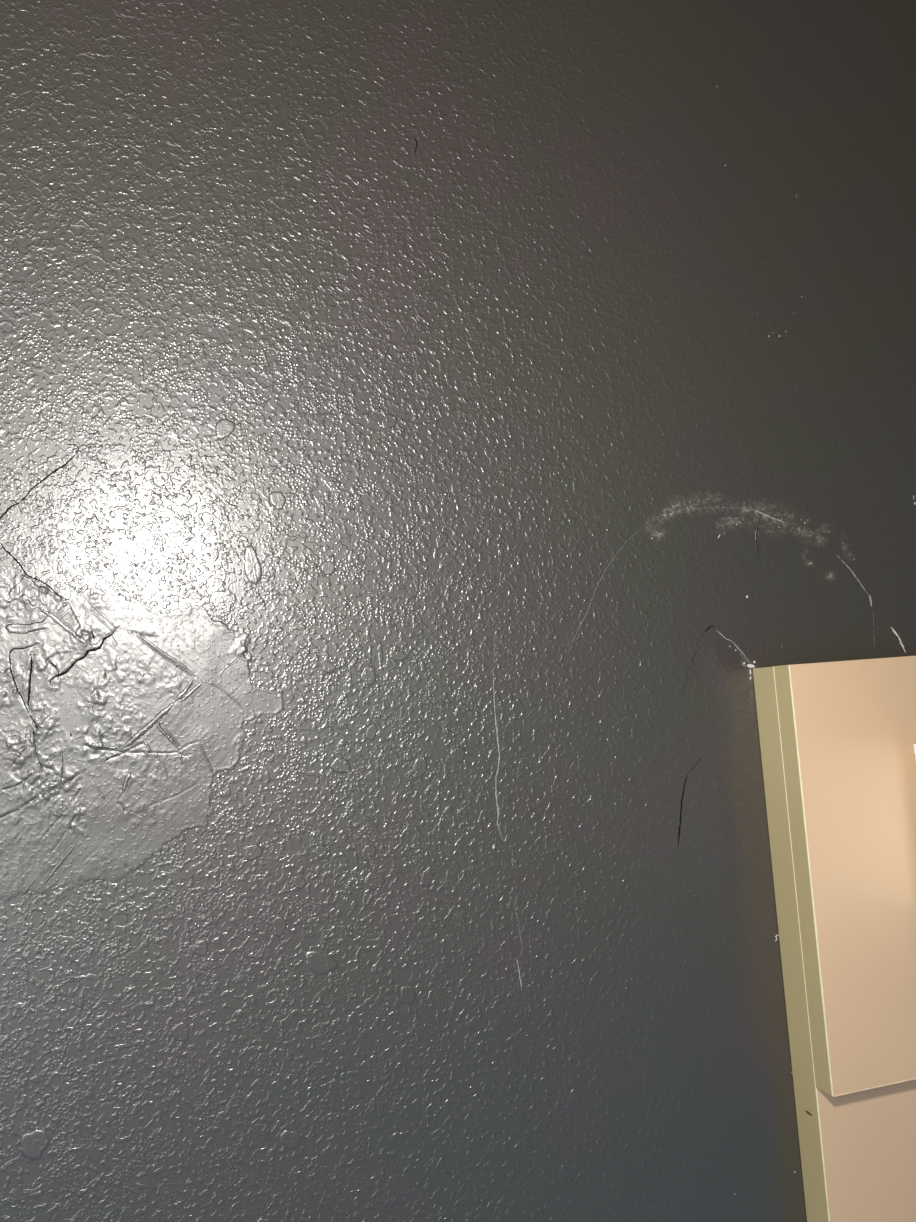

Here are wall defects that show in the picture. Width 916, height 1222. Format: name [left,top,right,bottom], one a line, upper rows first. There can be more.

crack [0,440,118,712]
crack [683,625,751,695]
crack [678,758,701,843]